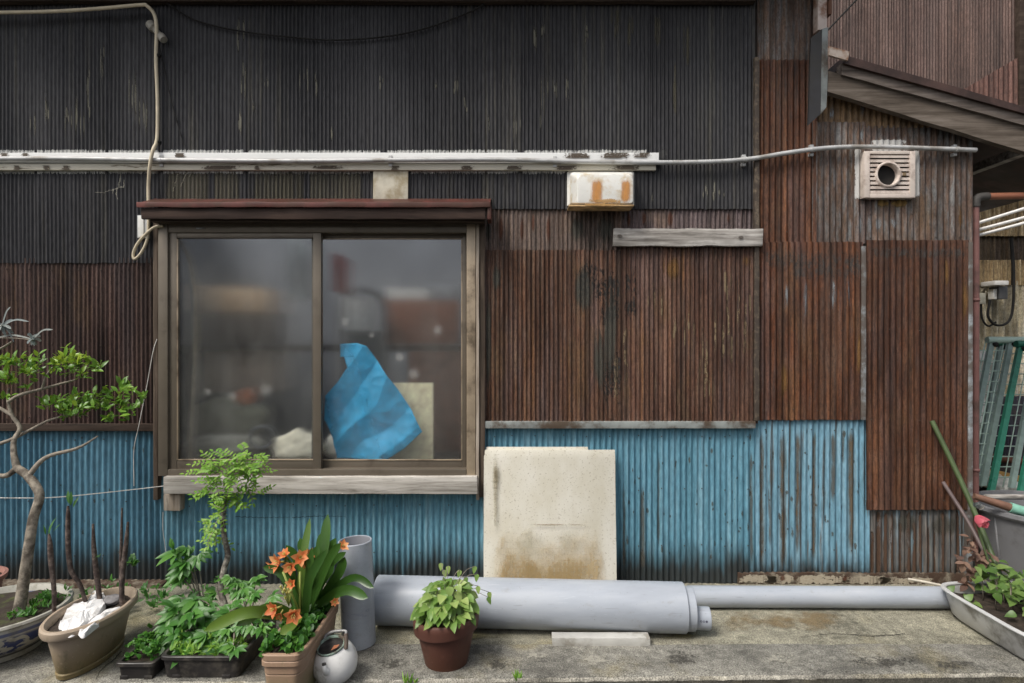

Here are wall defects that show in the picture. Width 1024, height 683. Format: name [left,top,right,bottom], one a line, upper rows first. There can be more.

rust [585,181,630,206]
leakage [575,258,637,404]
spalling [739,574,932,585]